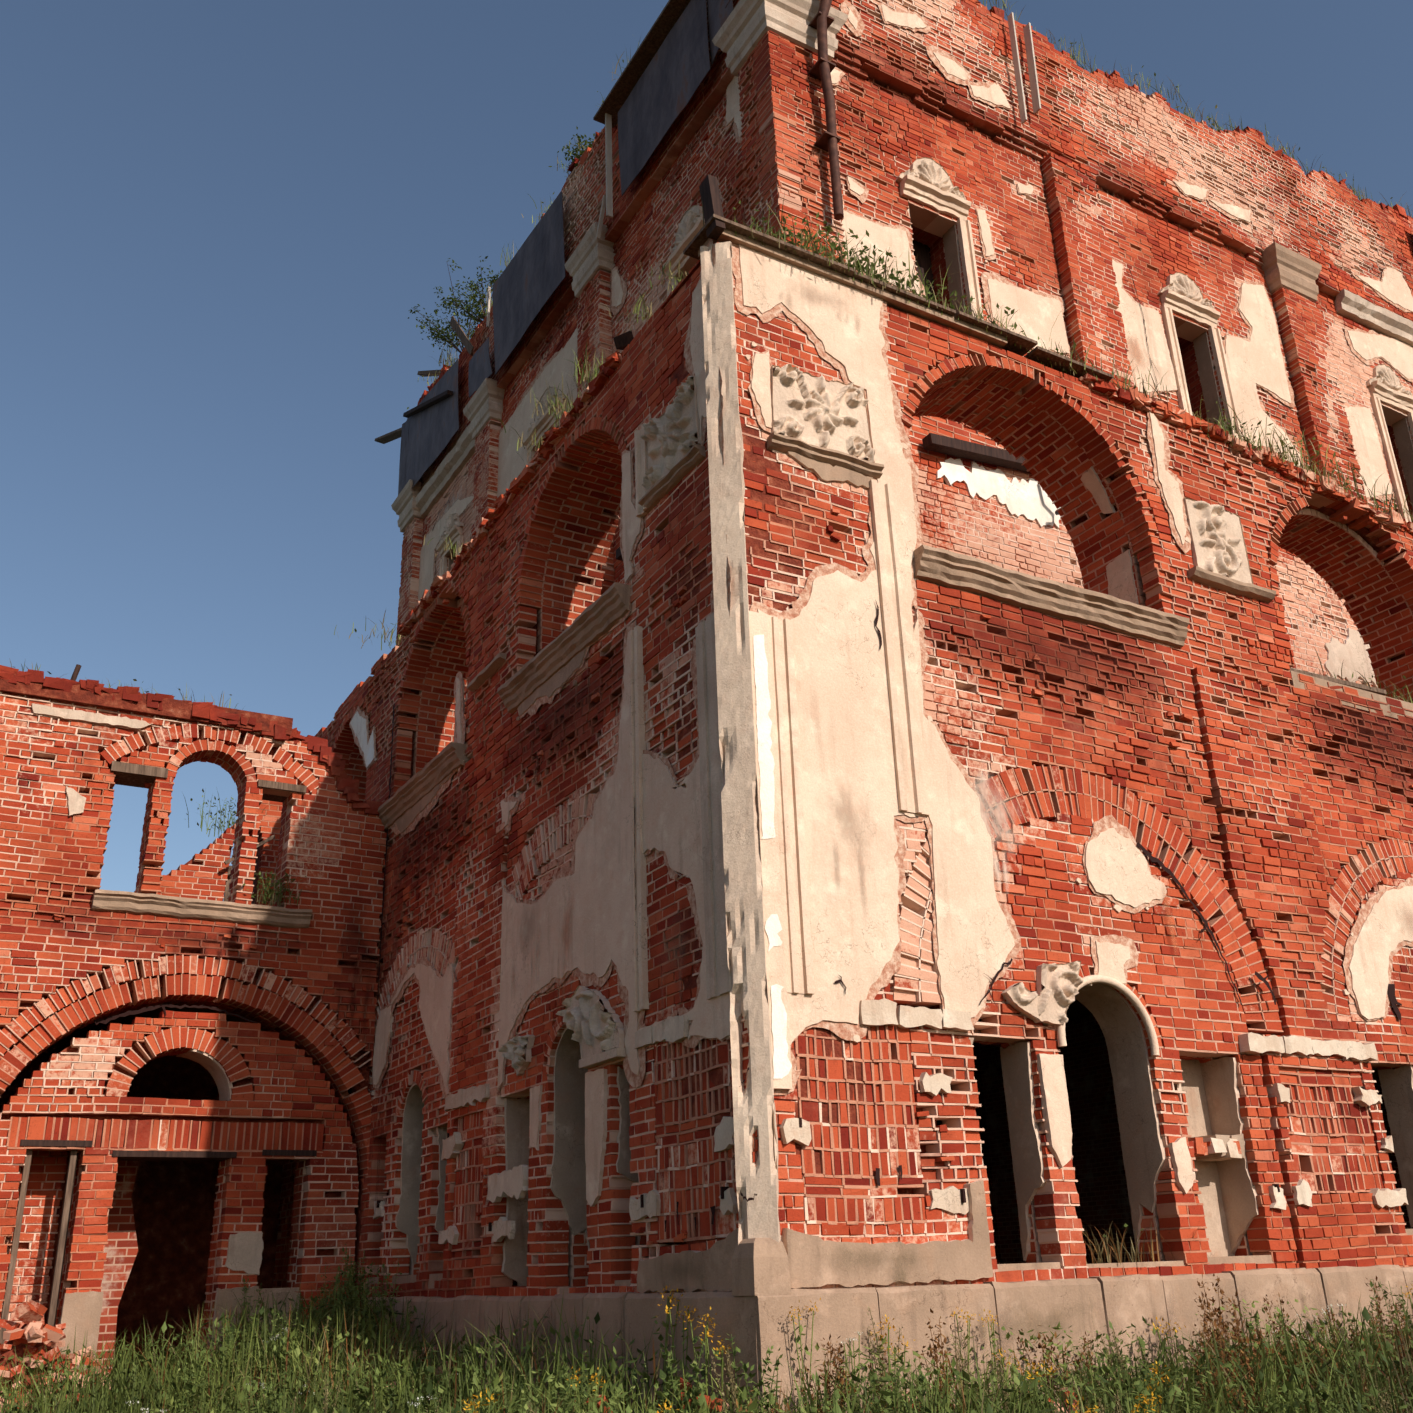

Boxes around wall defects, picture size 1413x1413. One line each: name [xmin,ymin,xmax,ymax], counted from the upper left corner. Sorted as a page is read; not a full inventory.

peeling [684,238,724,465]
peeling [1112,258,1347,554]
peeling [1344,328,1413,383]
peeling [1344,405,1413,509]
spalling [350,634,415,770]
peeling [731,176,1212,1095]
spalling [1201,628,1413,821]
peeling [388,449,731,1286]
peeling [1342,877,1413,1021]
peeling [1000,1040,1072,1261]
peeling [1075,935,1200,1253]
peeling [1378,1065,1413,1227]